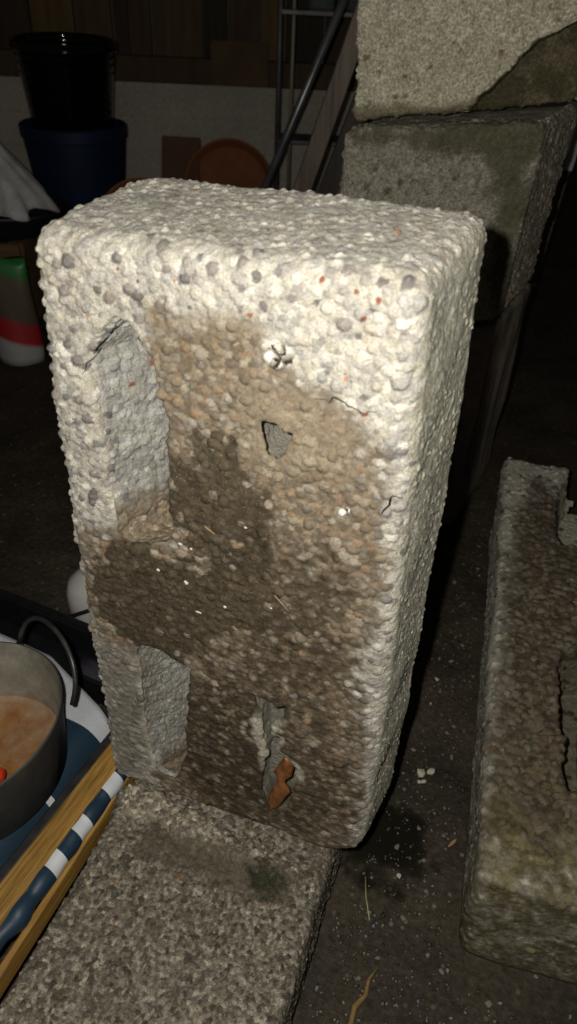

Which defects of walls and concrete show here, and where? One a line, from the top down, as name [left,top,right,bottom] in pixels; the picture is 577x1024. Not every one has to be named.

spalling [469,21,577,111]
crack [82,321,145,375]
leakage [264,340,294,368]
spalling [82,316,171,538]
spalling [262,421,293,459]
crack [315,397,372,414]
crack [381,495,403,514]
spalling [136,644,191,777]
spalling [250,696,304,810]